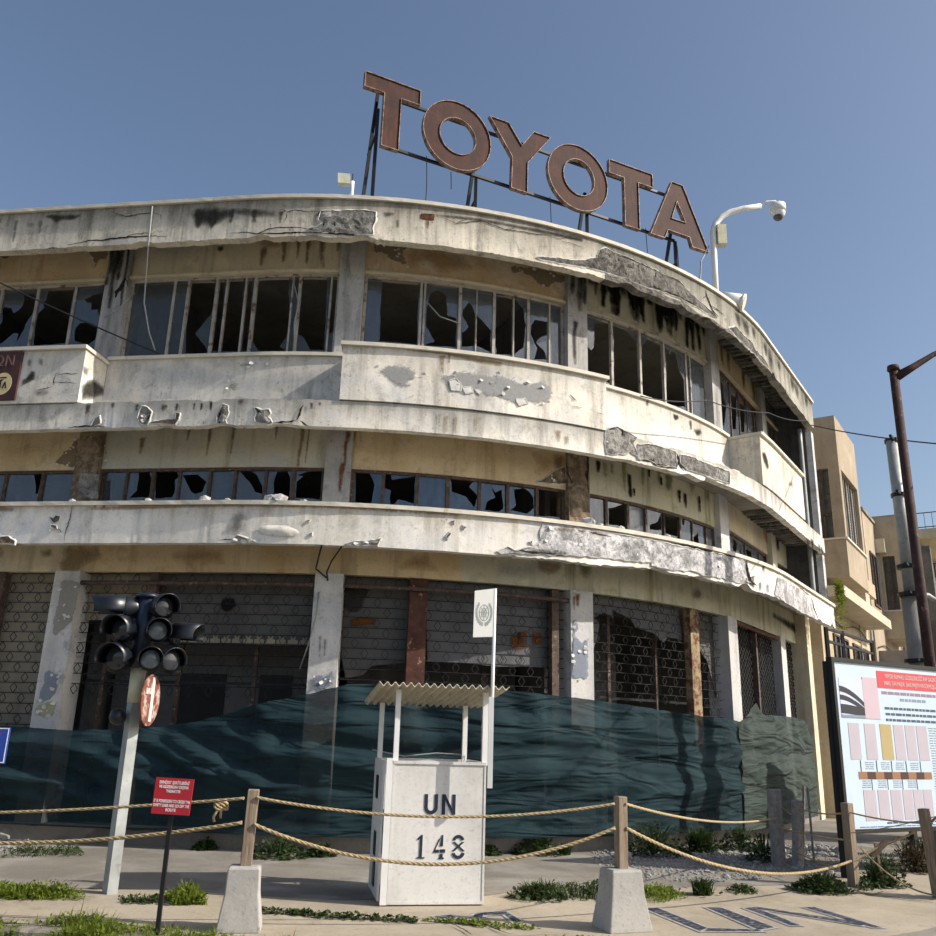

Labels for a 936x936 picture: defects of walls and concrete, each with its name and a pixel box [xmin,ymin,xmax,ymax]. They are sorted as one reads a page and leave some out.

leakage [194,208,284,228]
crack [230,209,321,234]
spalling [307,209,409,268]
leakage [571,275,705,351]
spalling [511,246,789,409]
peeling [379,363,426,386]
peeling [441,368,552,407]
peeling [55,415,104,467]
rust [339,431,350,491]
spalling [603,426,730,485]
spalling [496,522,750,584]
peeling [775,577,818,620]